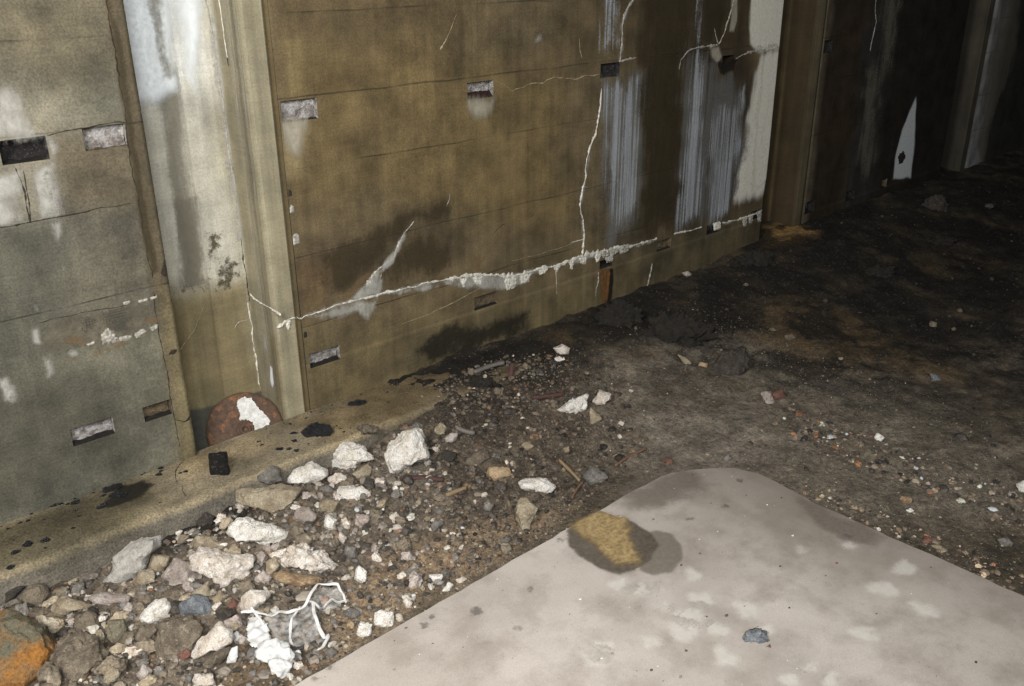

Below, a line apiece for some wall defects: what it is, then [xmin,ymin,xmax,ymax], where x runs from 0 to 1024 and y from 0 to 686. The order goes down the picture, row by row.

water stain [599,0,618,50]
crack [619,0,637,62]
crack [679,0,774,69]
water stain [603,0,784,238]
crack [235,40,762,385]
water stain [417,313,525,361]